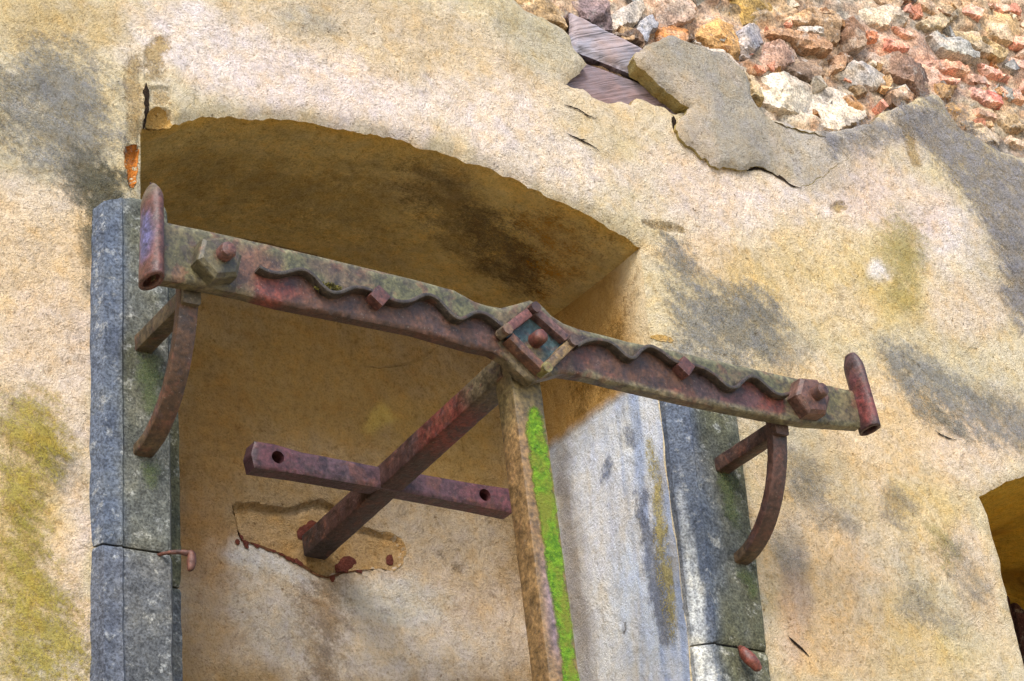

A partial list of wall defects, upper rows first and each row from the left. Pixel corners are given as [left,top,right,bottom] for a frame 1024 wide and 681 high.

crack [142,83,150,129]
crack [566,105,600,152]
crack [747,167,800,188]
spalling [232,498,407,582]